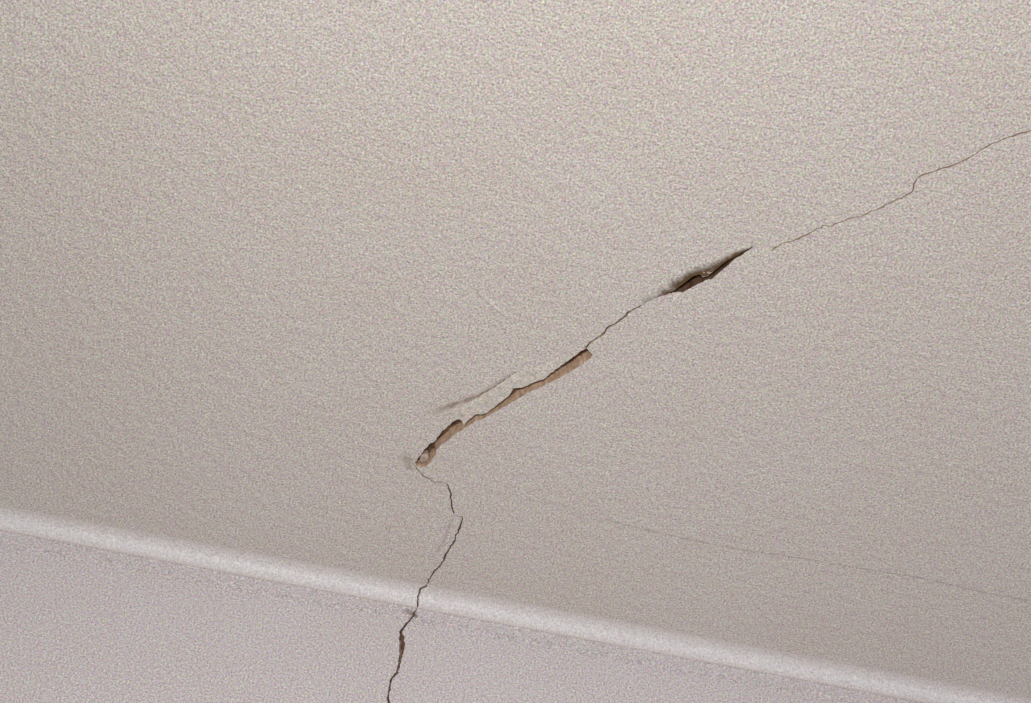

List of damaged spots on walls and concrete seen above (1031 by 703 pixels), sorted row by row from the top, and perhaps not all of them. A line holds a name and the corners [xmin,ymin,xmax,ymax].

crack [771,131,1031,251]
crack [584,302,646,350]
crack [387,465,463,703]